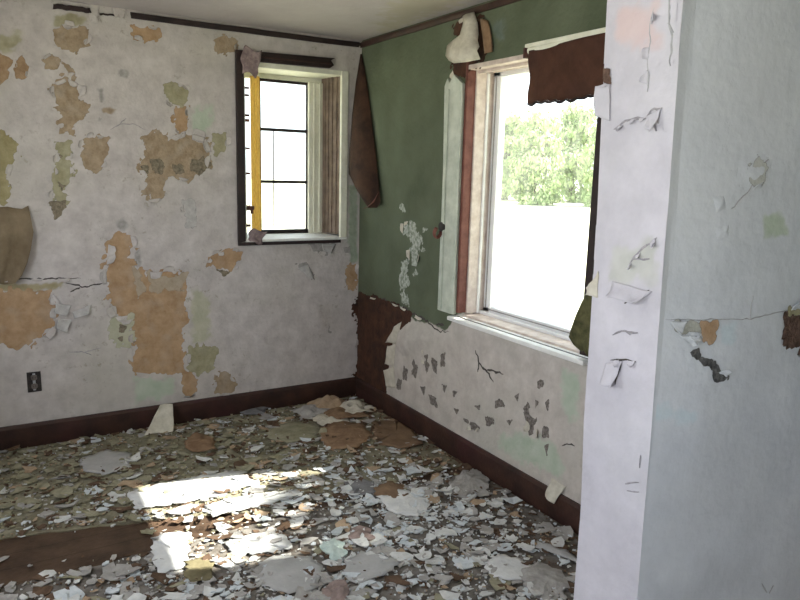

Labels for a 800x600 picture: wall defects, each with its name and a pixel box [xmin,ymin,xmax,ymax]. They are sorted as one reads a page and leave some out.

peeling [130,24,162,44]
peeling [0,129,22,206]
peeling [41,20,110,220]
peeling [136,81,232,204]
peeling [0,285,60,351]
peeling [99,231,243,398]
peeling [344,203,428,393]
flaking render [396,350,457,408]
crack [475,350,503,381]
peeling [670,319,732,383]
flaking render [454,405,494,432]
flaking render [515,393,549,456]